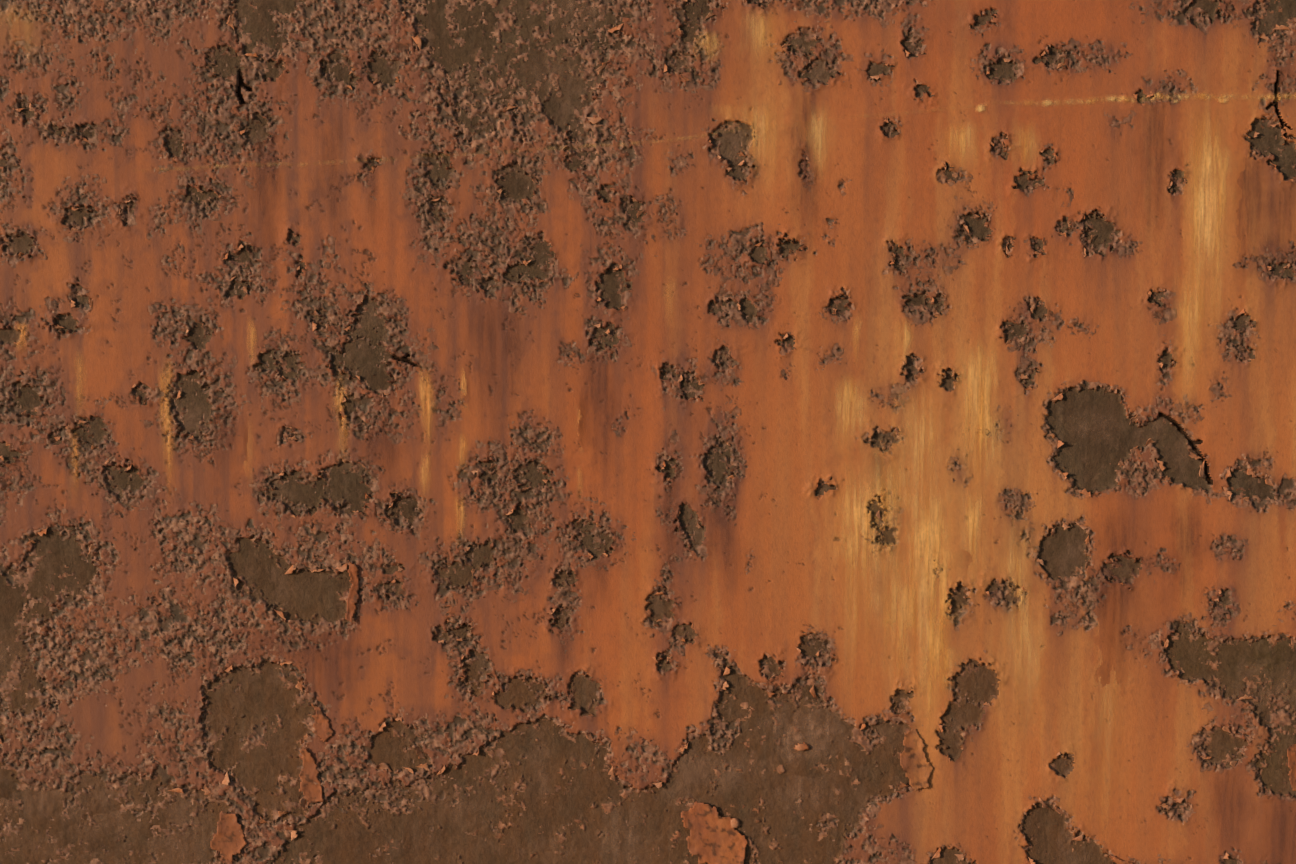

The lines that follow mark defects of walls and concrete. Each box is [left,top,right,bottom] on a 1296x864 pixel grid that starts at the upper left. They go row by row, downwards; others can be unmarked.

peeling [0,0,664,203]
corrosion [937,129,1122,258]
crack [1082,92,1231,103]
crack [1266,70,1293,138]
corrosion [129,44,651,717]
corrosion [651,222,817,567]
peeling [1013,381,1296,636]
crack [1159,413,1213,485]
peeling [0,488,977,864]
corrosion [816,476,1028,763]
peeling [1123,600,1296,802]
peeling [1014,795,1187,864]